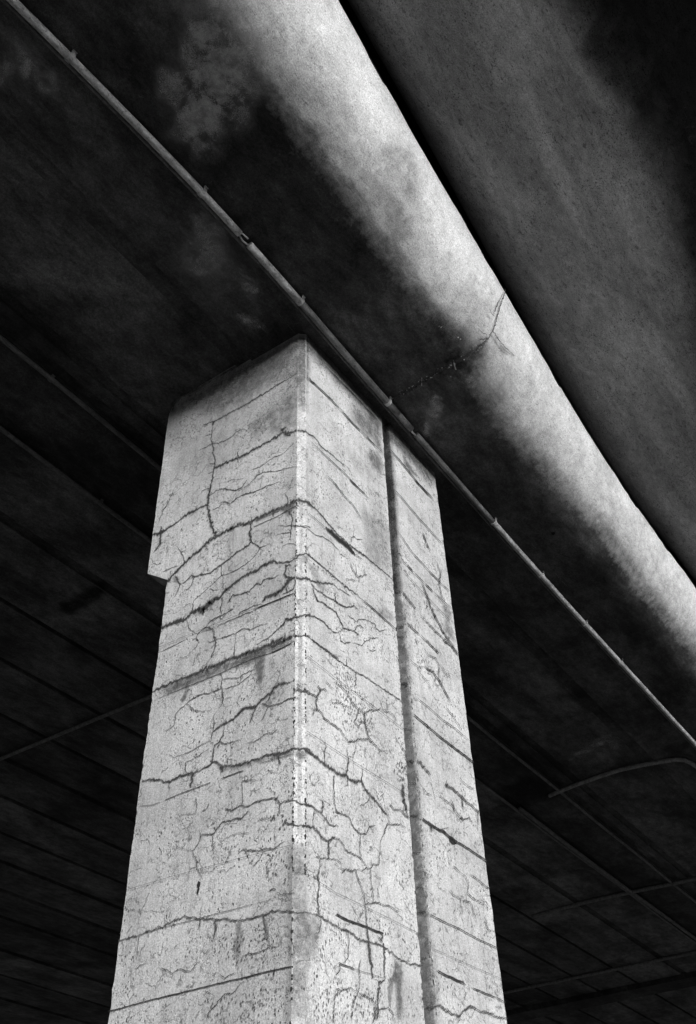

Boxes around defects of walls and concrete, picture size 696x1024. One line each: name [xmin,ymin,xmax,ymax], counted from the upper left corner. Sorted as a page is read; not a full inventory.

crack [391,289,514,401]
crack [118,373,480,1023]
crack [450,865,492,933]
crack [425,1004,507,1023]